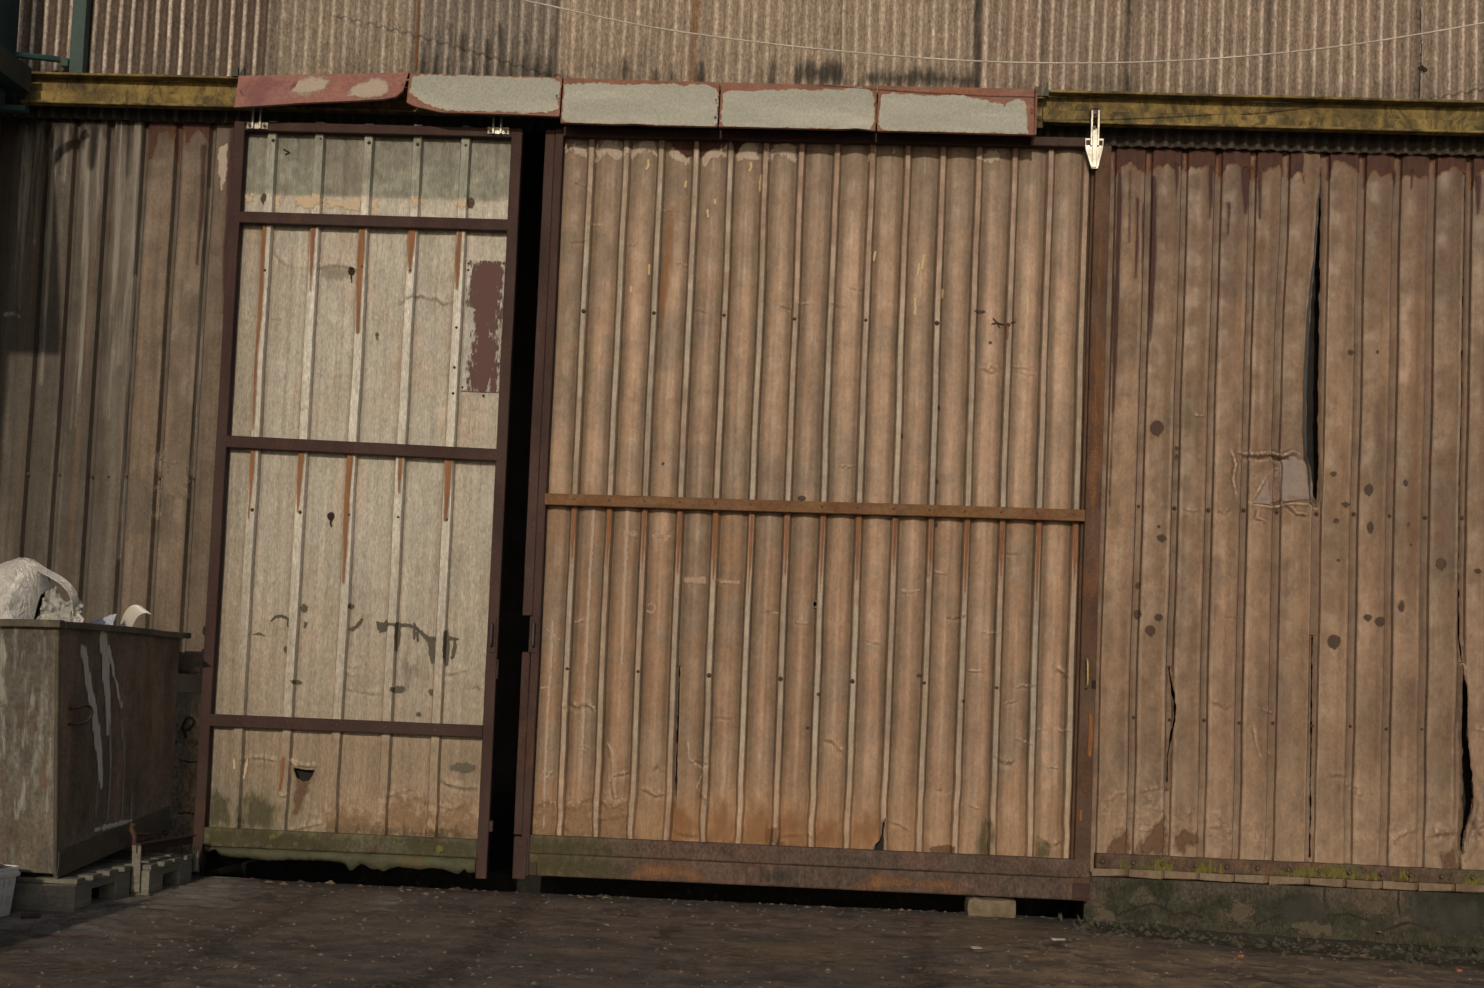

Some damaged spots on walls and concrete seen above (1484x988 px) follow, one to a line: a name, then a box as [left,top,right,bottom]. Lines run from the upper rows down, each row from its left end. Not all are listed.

peeling [347,78,389,98]
peeling [409,74,1029,134]
leakage [217,143,228,190]
rust [408,229,416,272]
rust [356,228,365,334]
leakage [18,120,141,517]
rust [252,225,266,428]
rust [342,454,353,583]
rust [444,459,452,521]
peeling [1253,453,1309,504]
leakage [289,758,309,814]